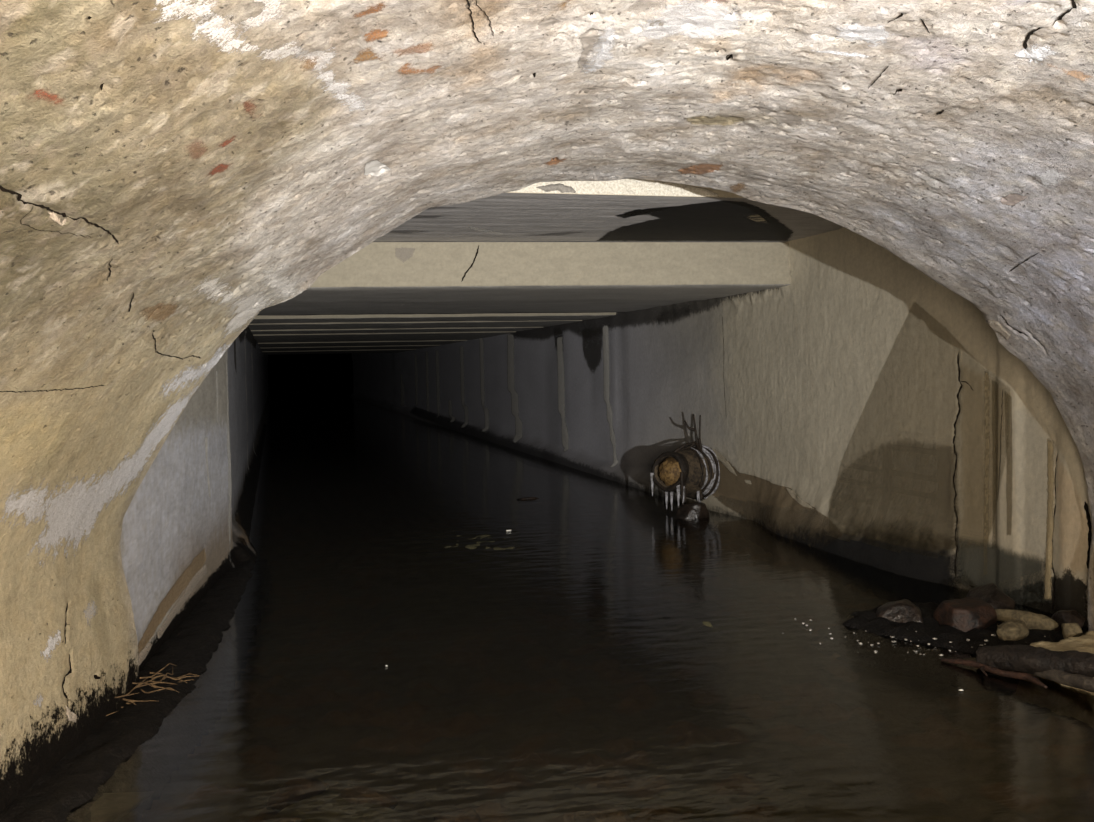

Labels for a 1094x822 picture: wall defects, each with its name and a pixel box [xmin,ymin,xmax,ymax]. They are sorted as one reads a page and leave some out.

damp [152,0,366,111]
rust [356,3,385,18]
rust [354,29,388,63]
rust [398,44,440,75]
crack [466,0,494,44]
crack [1023,0,1077,49]
crack [0,185,118,281]
crack [461,246,479,282]
damp [0,266,304,565]
crack [953,352,974,588]
crack [62,603,77,723]
damp [0,420,267,813]